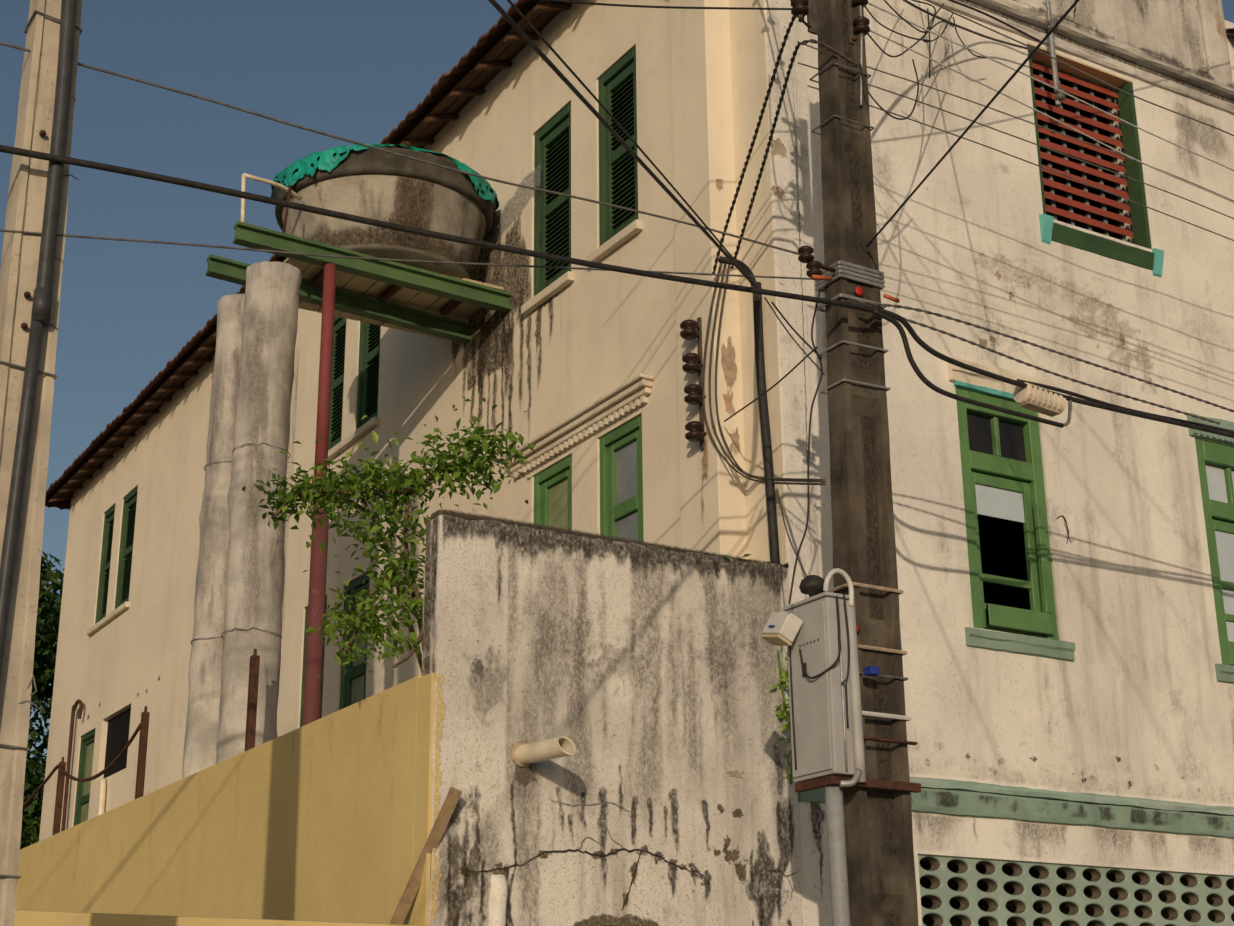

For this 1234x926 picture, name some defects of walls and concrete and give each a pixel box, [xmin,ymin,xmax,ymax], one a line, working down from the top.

damp [957,0,1234,104]
damp [307,176,564,441]
peeling [719,335,741,457]
damp [423,510,787,675]
damp [471,648,503,713]
damp [535,576,679,868]
damp [439,752,535,926]
crack [457,800,711,910]
damp [702,746,794,926]
damp [811,802,825,882]
damp [573,914,658,926]